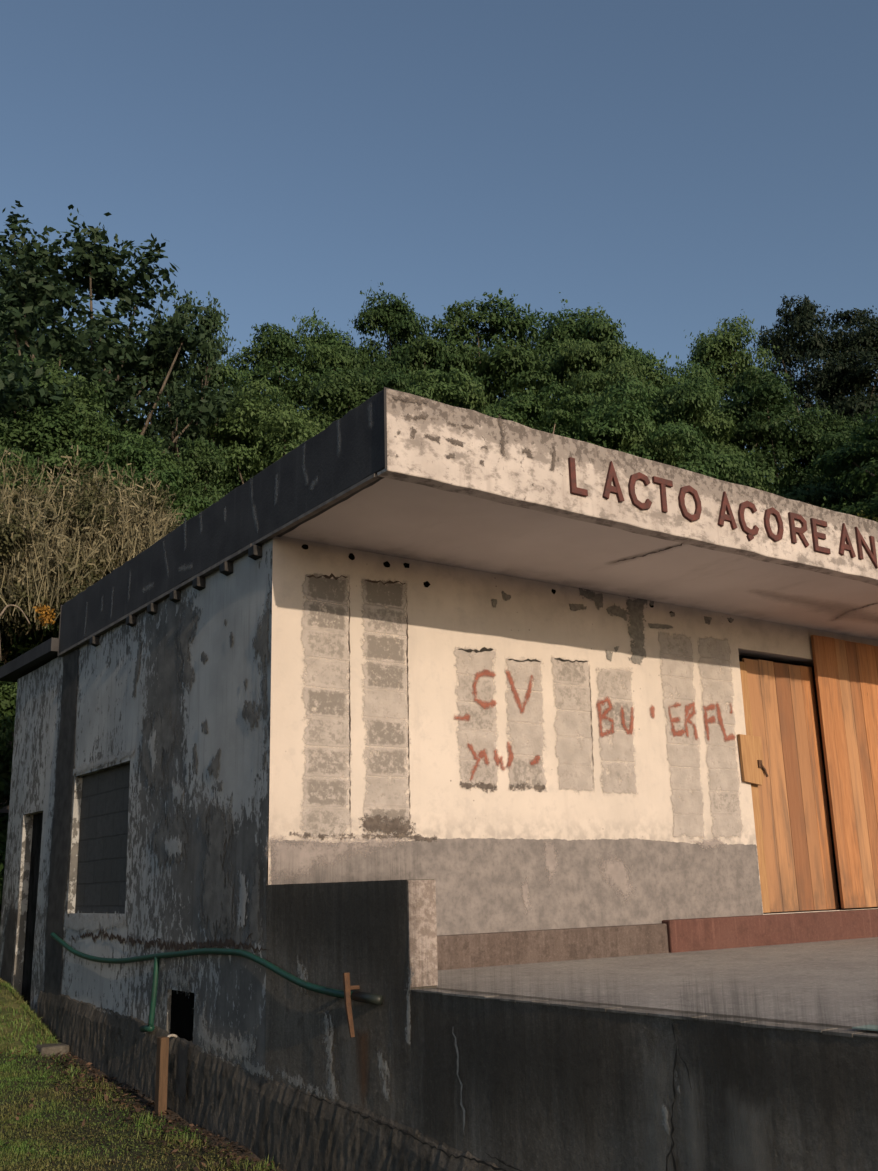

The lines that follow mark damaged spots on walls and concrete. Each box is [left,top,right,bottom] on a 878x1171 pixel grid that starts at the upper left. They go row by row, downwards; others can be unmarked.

peeling [173,592,207,696]
peeling [242,590,271,803]
peeling [73,705,223,804]
peeling [460,781,545,793]
peeling [162,834,182,858]
peeling [63,910,127,933]
crack [297,1031,522,1171]
crack [661,1023,691,1171]